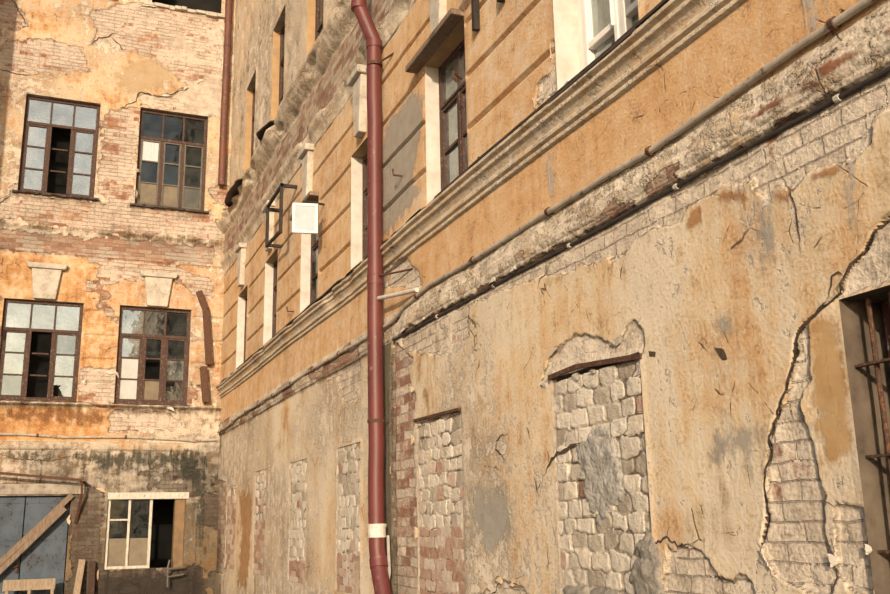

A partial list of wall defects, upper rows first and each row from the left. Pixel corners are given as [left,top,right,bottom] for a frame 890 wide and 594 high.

crack [90,32,123,50]
crack [116,84,189,110]
spalling [532,34,568,108]
spalling [0,0,224,301]
crack [782,177,801,252]
spalling [390,63,890,594]
crack [761,216,890,546]
leakage [75,447,207,551]